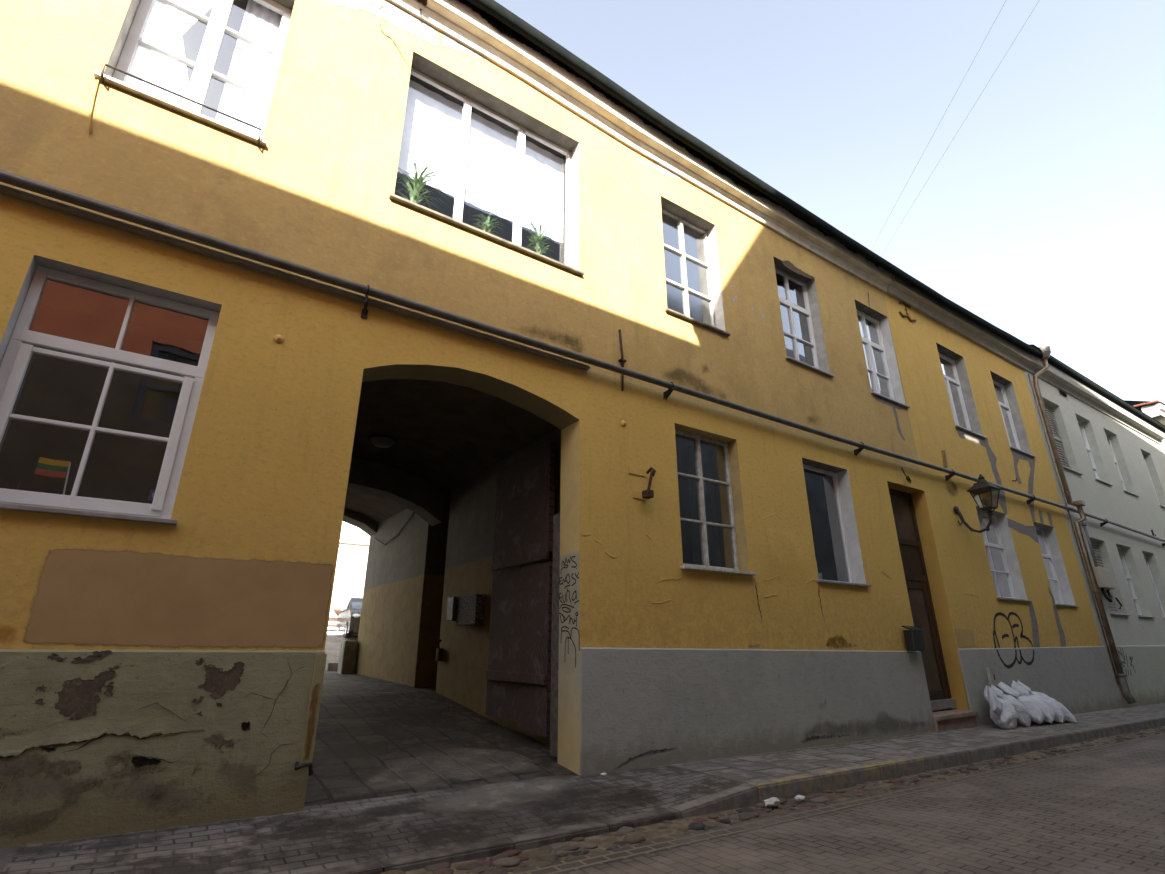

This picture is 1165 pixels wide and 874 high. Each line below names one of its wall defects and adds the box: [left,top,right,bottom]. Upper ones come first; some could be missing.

flaking render [326,0,491,62]
spalling [459,0,885,270]
spalling [33,650,121,720]
crack [0,702,205,763]
spalling [131,756,161,768]
spalling [192,658,245,716]
crack [240,652,305,783]